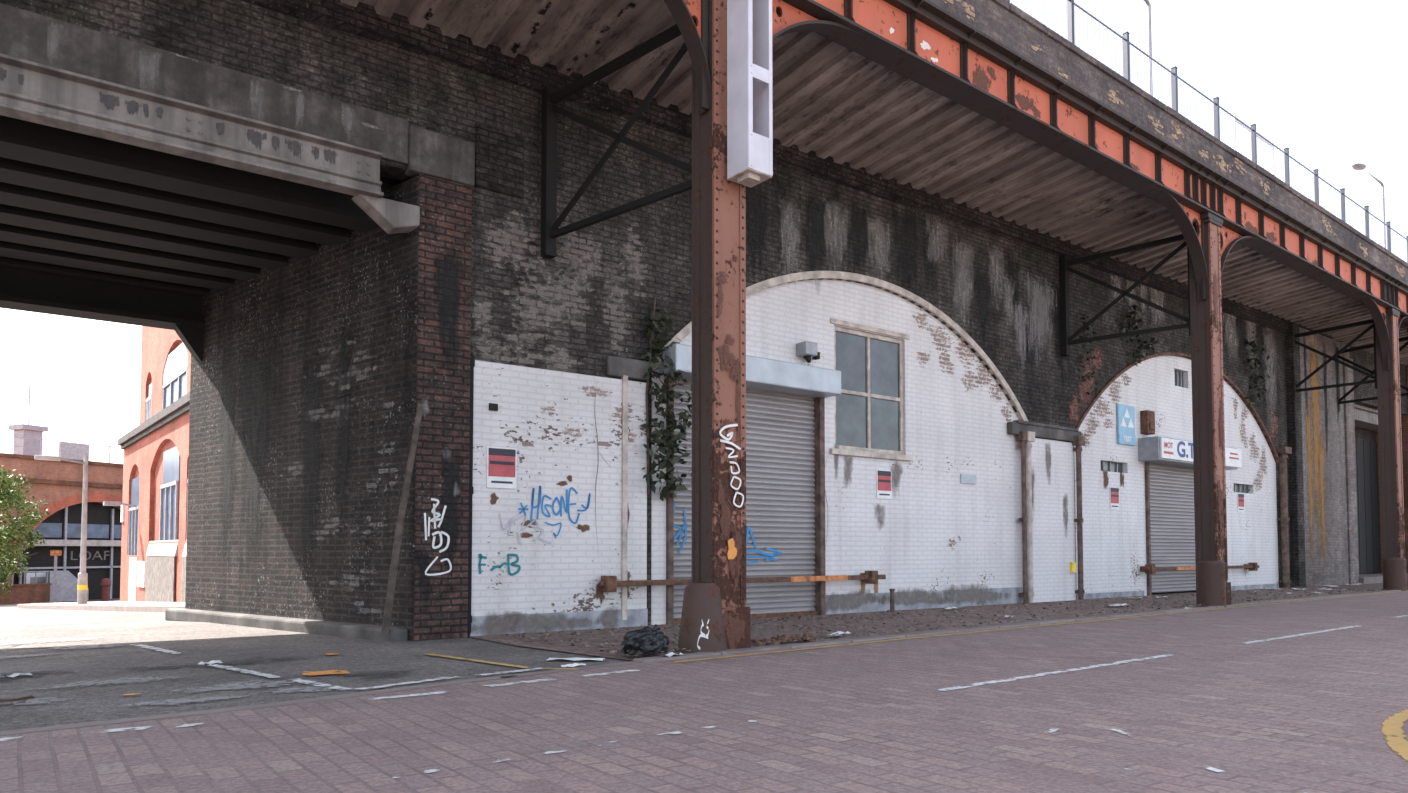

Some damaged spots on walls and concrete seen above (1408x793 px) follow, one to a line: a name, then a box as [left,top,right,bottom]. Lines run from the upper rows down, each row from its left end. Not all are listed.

spalling [944,0,983,21]
leakage [100,92,163,118]
leakage [247,130,336,163]
spalling [1198,149,1270,196]
leakage [746,183,943,288]
leakage [436,253,460,353]
leakage [956,248,1061,361]
peeling [583,387,636,442]
corrosion [718,334,741,451]
peeling [913,314,1012,422]
spalling [1069,348,1132,446]
corrosion [718,470,743,592]